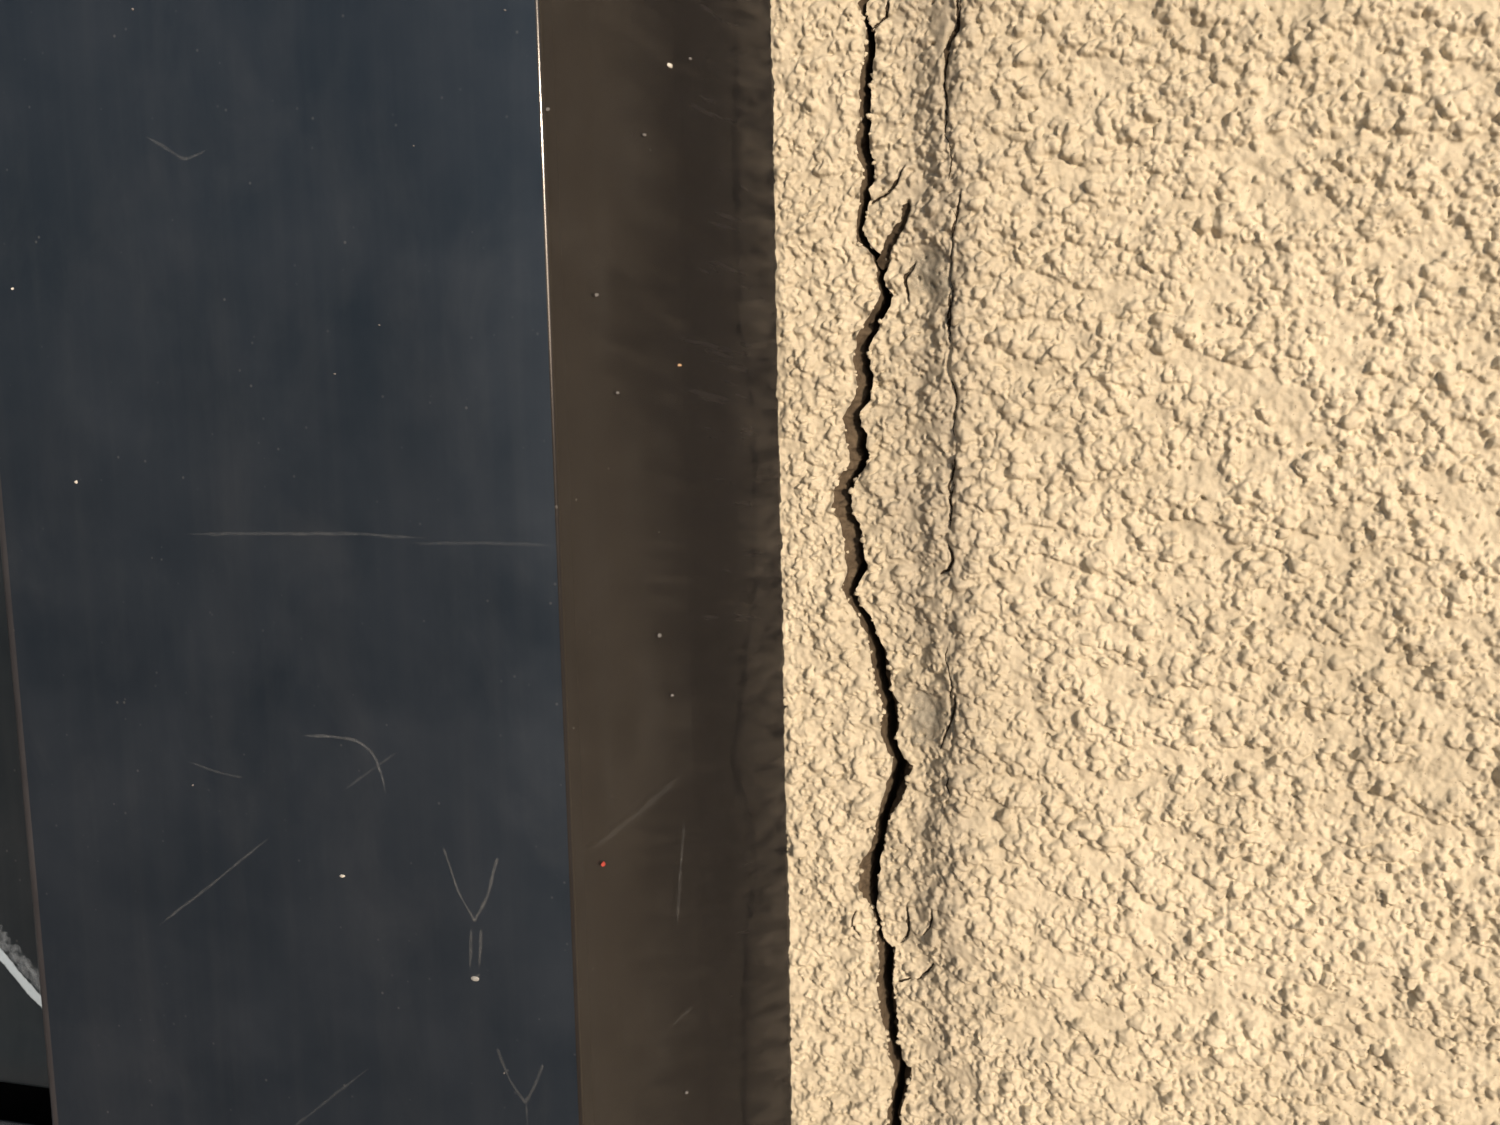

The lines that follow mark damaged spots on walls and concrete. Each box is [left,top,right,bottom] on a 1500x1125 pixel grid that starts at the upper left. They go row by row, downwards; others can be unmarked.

crack [829,0,961,1125]